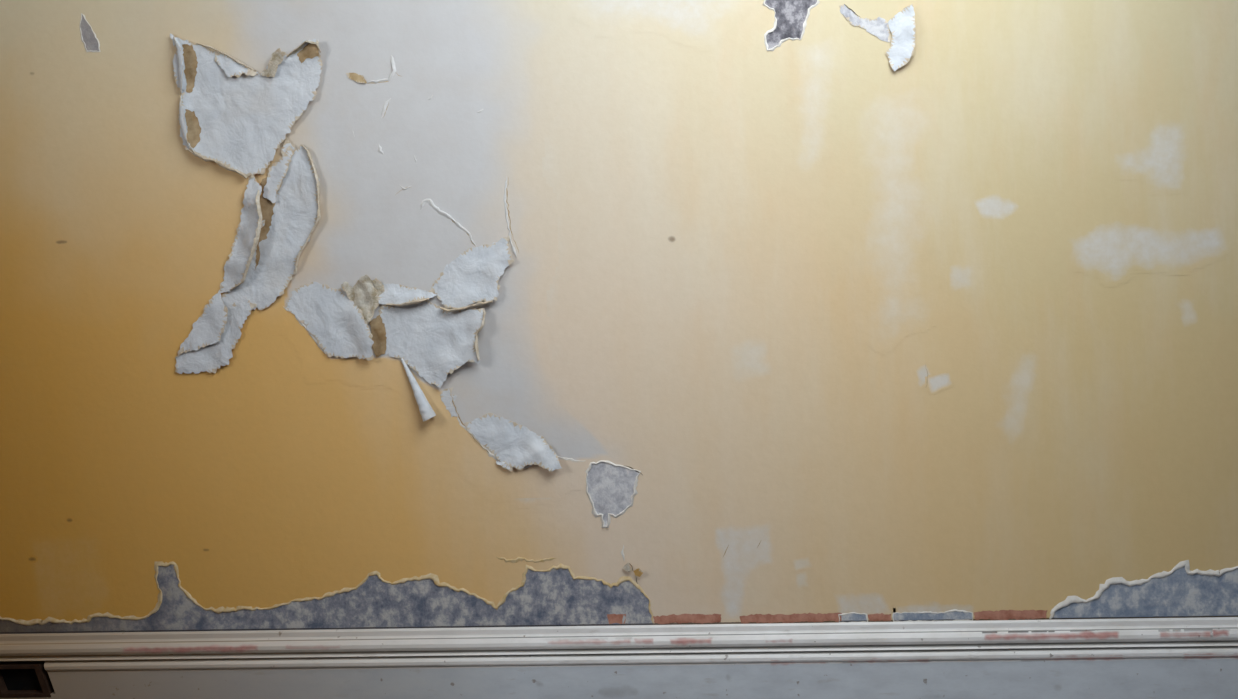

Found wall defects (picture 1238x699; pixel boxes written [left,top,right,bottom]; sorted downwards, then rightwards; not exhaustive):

flaking render [80,13,101,52]
flaking render [763,0,820,51]
peeling [839,4,916,72]
peeling [170,0,646,532]
flaking render [0,545,714,656]
flaking render [892,609,973,622]
flaking render [982,560,1238,663]